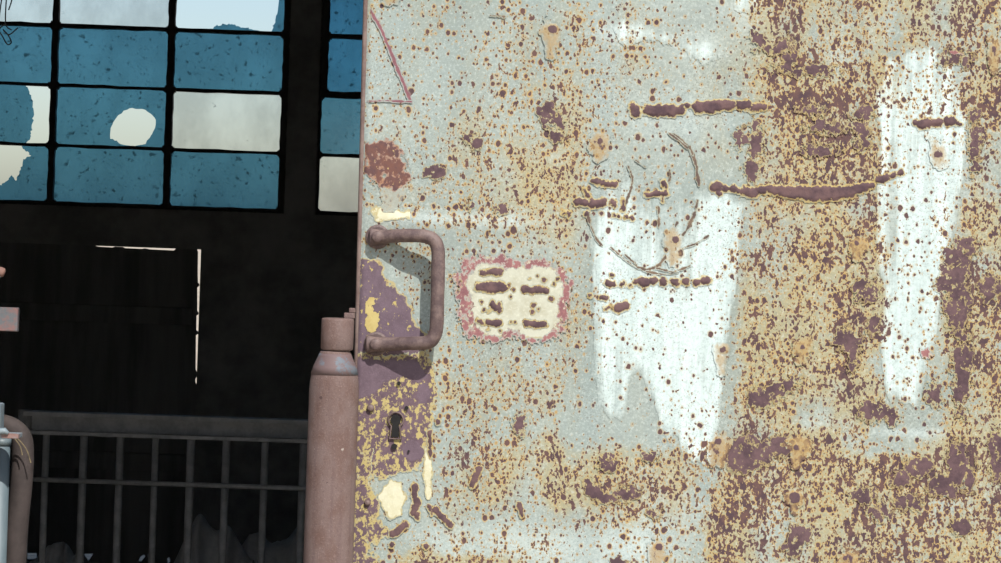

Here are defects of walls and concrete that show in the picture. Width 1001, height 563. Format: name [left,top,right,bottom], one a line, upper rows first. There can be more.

corrosion [364,137,450,213]
corrosion [560,175,636,223]
corrosion [627,97,907,205]
corrosion [911,107,988,181]
corrosion [587,225,714,315]
corrosion [922,235,1001,422]
peeling [353,257,455,563]
corrosion [857,398,902,431]
corrosion [581,450,665,522]
corrosion [706,430,813,476]
corrosion [780,488,813,559]
corrosion [846,426,1001,525]